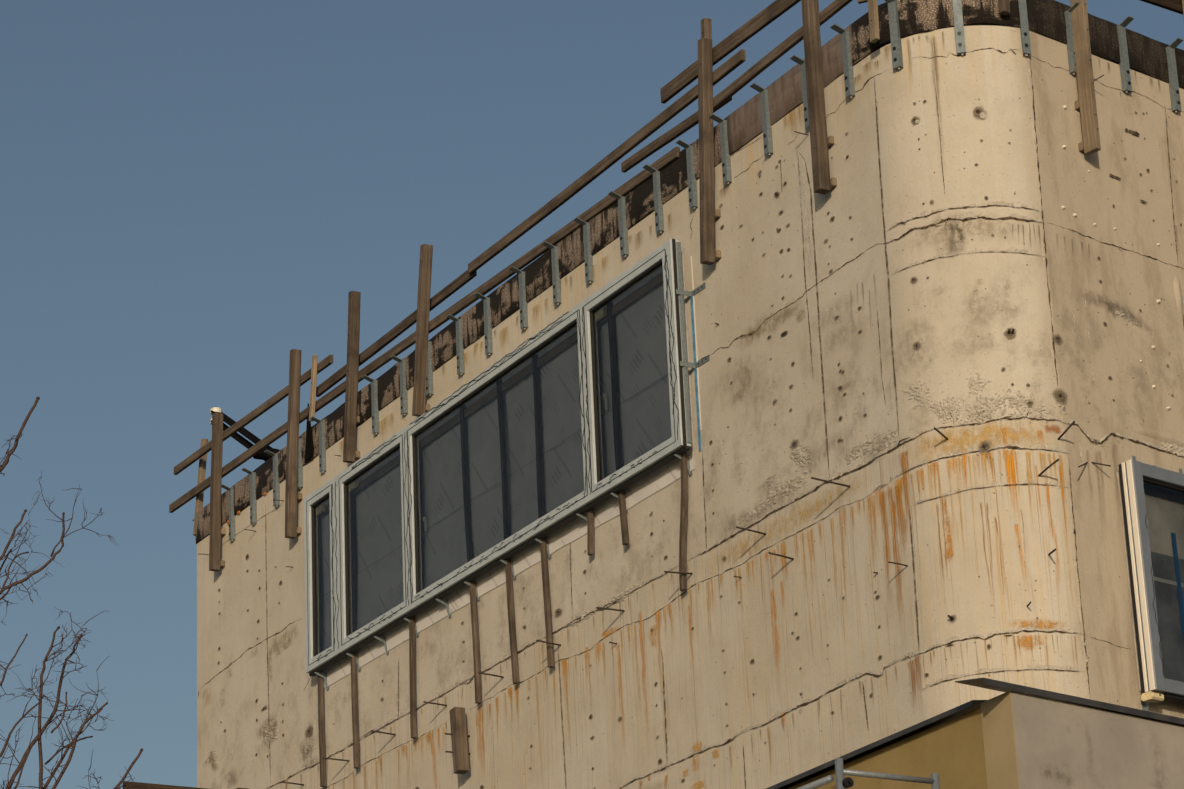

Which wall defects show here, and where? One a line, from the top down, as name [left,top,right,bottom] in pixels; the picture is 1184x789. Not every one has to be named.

crack [698,201,1183,361]
crack [266,411,1130,789]
rust [536,426,1066,691]